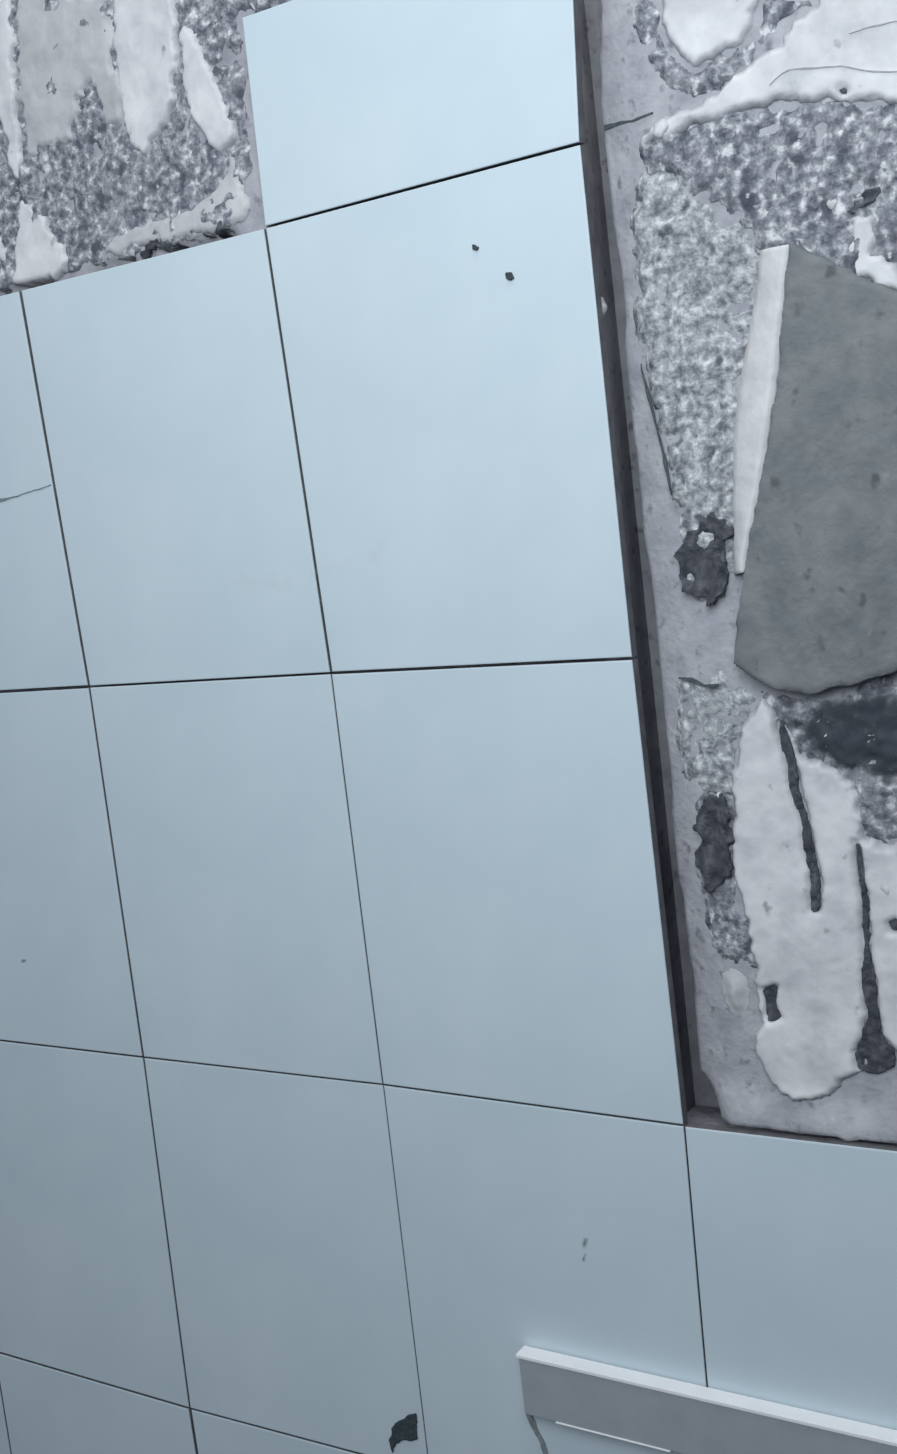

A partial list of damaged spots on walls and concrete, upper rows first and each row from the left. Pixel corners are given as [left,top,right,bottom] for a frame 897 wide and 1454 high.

spalling [0,0,291,294]
spalling [629,0,897,607]
crack [0,484,51,502]
flaking render [675,671,897,1102]
peeling [389,1413,418,1453]
crack [526,1414,548,1454]